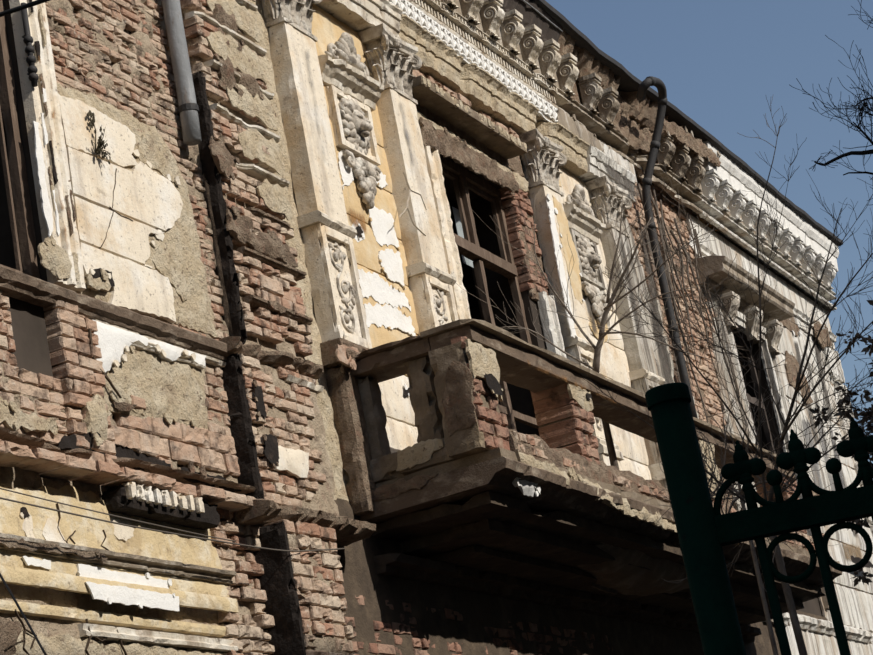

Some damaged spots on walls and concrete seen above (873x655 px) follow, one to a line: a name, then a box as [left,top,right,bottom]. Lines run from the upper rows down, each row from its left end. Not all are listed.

peeling [29,0,47,60]
spalling [211,3,264,100]
peeling [32,73,115,292]
crack [99,168,133,249]
spalling [133,135,180,185]
spalling [150,228,198,302]
spalling [208,134,240,180]
spalling [226,205,299,268]
peeling [351,206,416,336]
spalling [0,319,241,493]
spalling [372,360,477,501]
spalling [512,449,677,533]